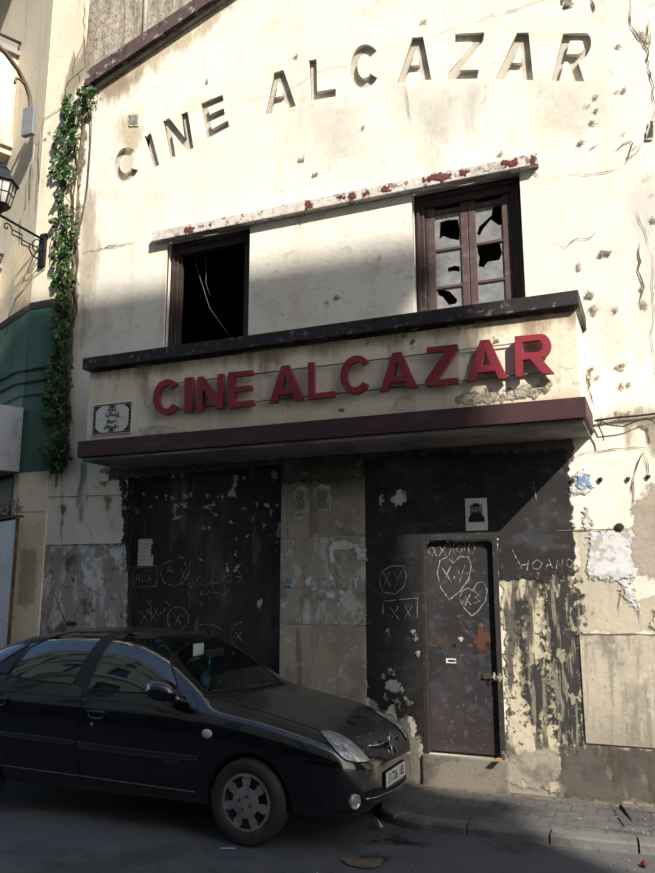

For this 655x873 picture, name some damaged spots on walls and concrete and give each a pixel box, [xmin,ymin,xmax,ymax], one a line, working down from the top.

crack [629,0,655,118]
peeling [336,190,370,200]
peeling [405,167,470,183]
peeling [498,150,518,167]
crack [531,140,655,178]
crack [636,211,655,355]
spalling [455,377,553,406]
crack [559,326,596,408]
crack [577,447,653,508]
flaking render [370,668,423,783]